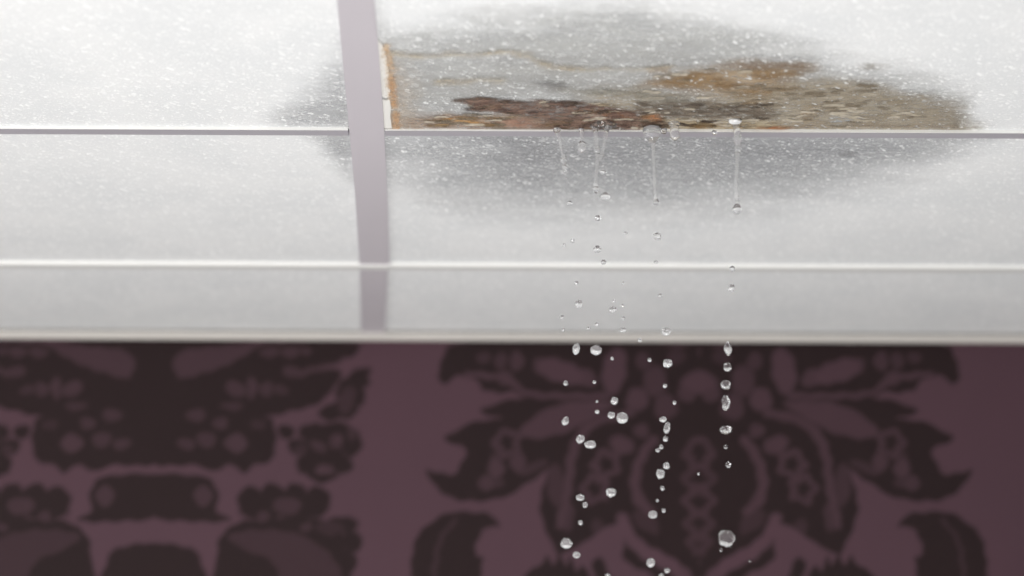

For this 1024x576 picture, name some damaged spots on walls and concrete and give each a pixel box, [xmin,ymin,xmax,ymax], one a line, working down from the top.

water stain [387,25,950,129]